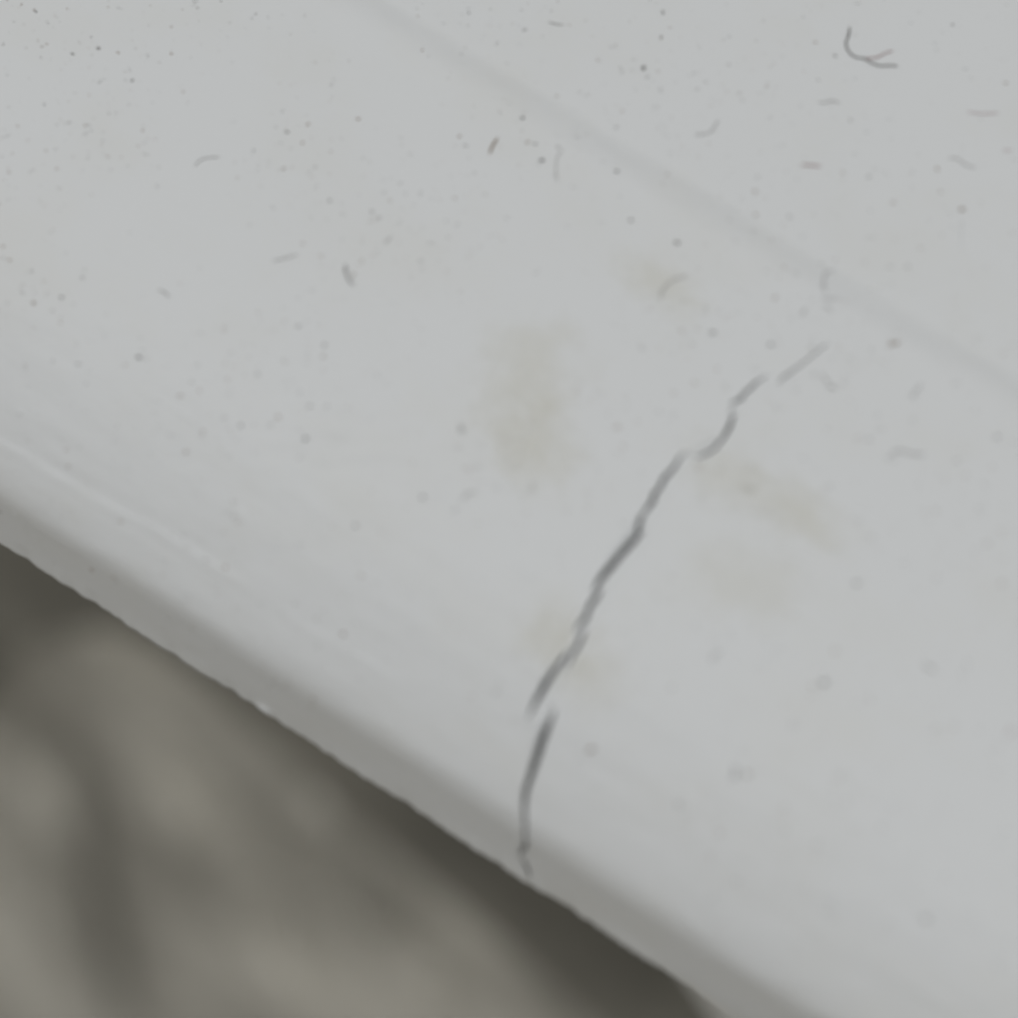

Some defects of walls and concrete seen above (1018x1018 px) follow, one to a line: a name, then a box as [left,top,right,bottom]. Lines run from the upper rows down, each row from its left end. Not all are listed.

crack [520,344,826,876]